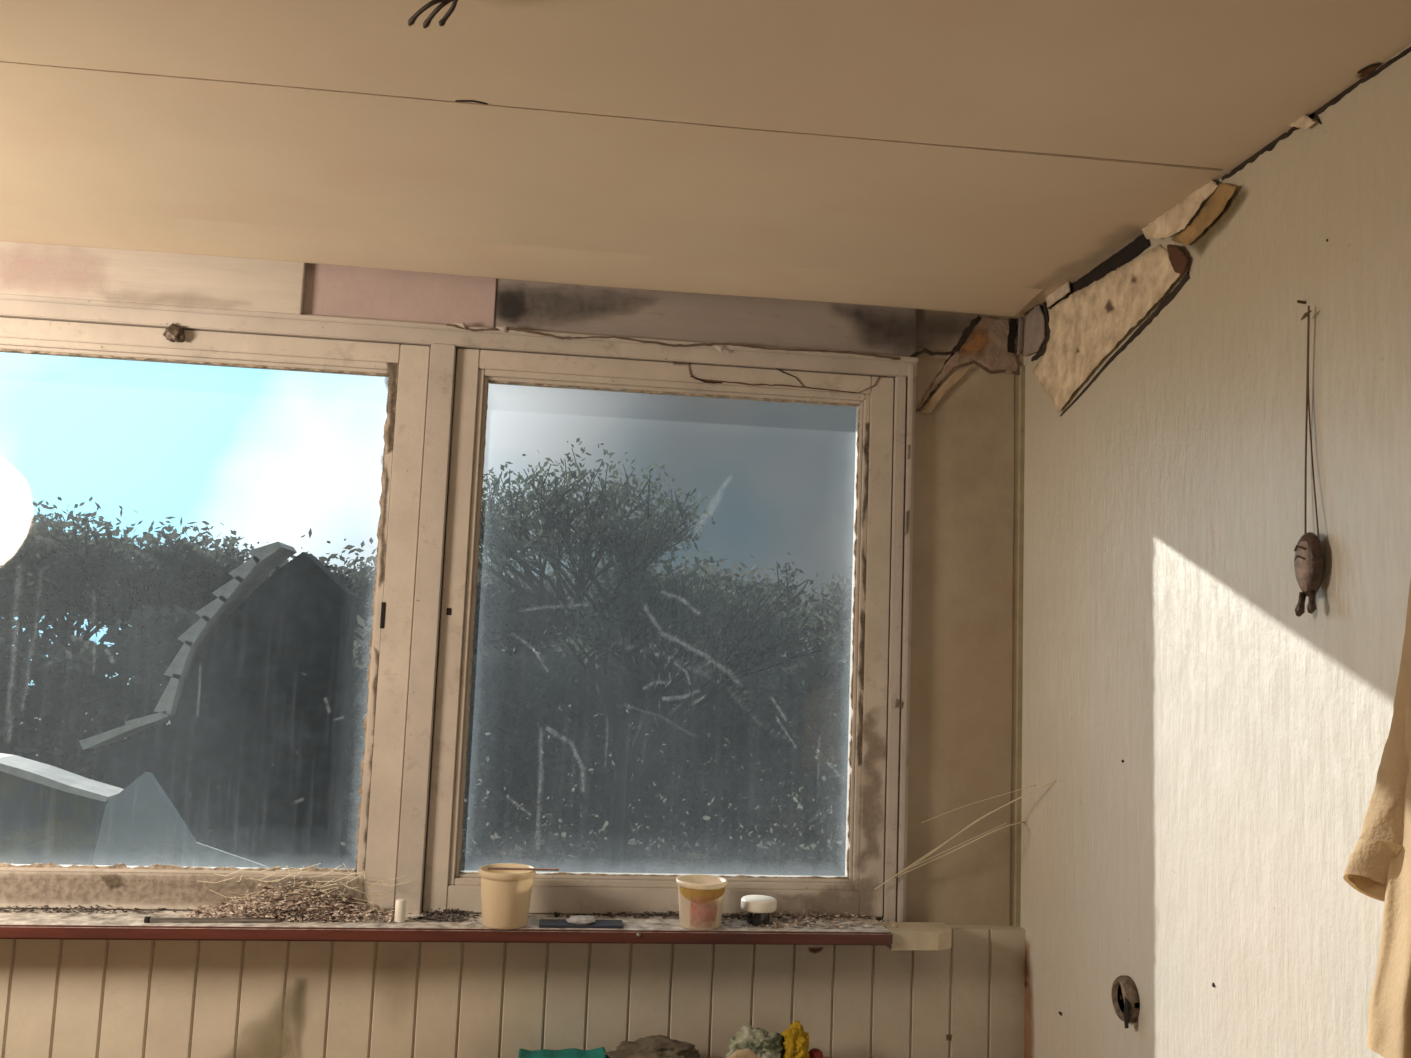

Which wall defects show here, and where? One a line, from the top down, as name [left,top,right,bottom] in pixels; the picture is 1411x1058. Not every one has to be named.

water stain [501,294,613,317]
peeling [1016,179,1244,362]
crack [446,323,973,393]
water stain [236,997,300,1058]